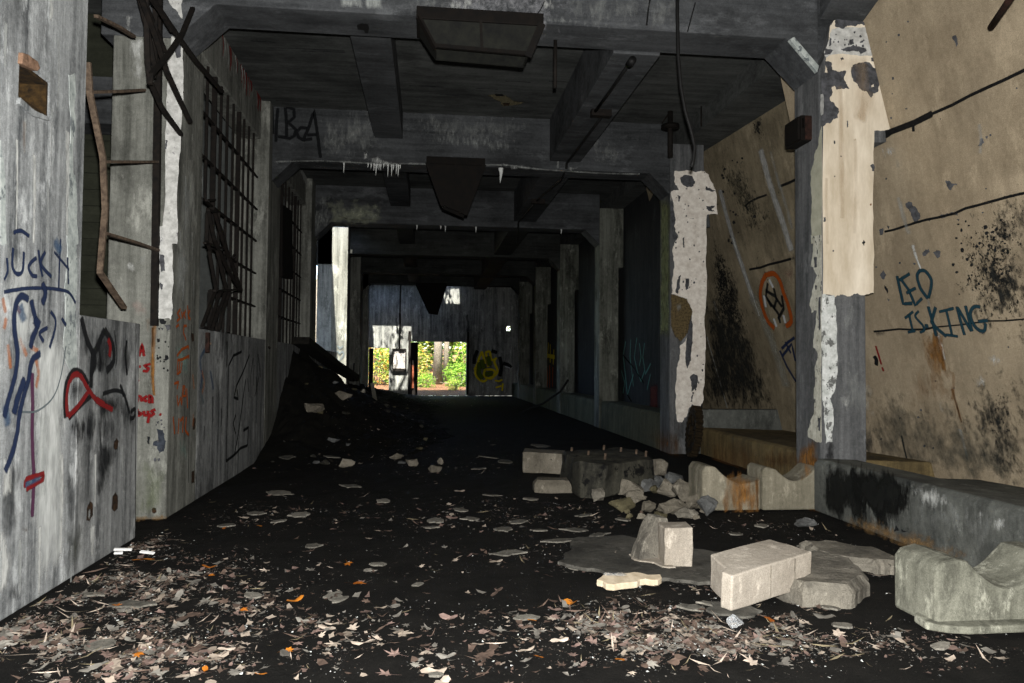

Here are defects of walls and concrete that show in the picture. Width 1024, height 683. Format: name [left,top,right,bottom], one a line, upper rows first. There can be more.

peeling [821,19,879,127]
peeling [670,175,715,263]
leakage [706,118,793,408]
peeling [905,202,920,222]
mould [952,202,1023,325]
spalling [671,275,705,402]